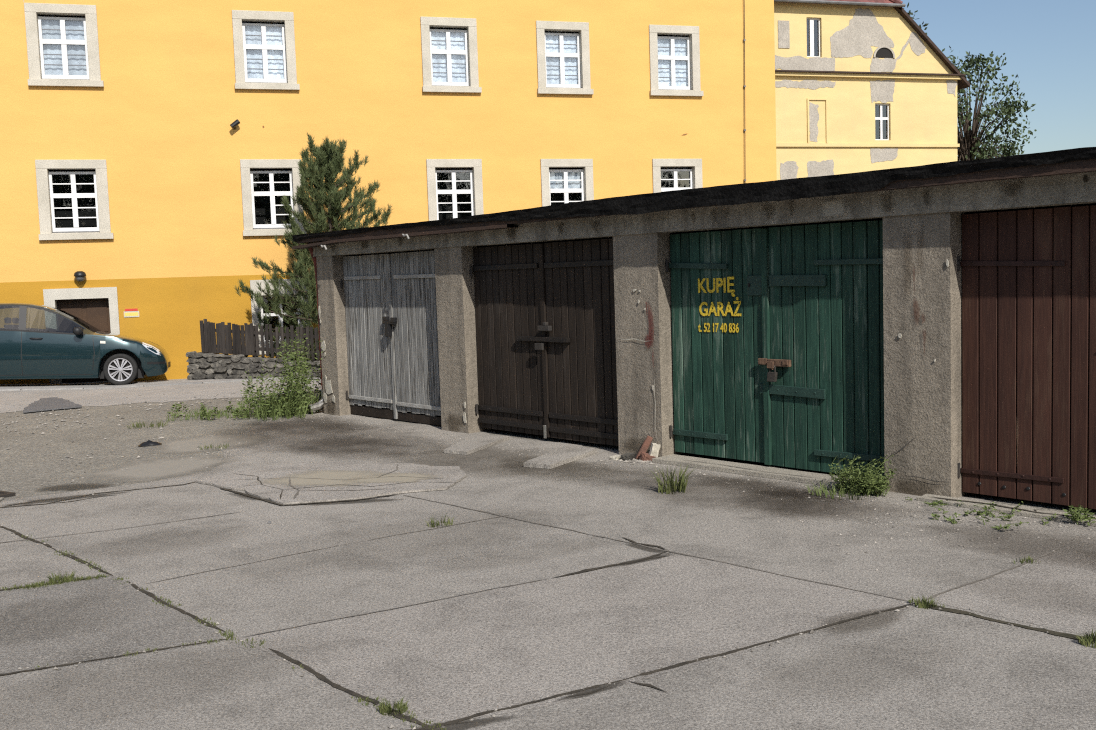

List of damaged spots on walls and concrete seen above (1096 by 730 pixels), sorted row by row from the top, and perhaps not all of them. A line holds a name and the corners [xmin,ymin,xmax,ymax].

flaking render [775,8,926,142]
flaking render [780,159,834,180]
corrosion [645,303,654,364]
crack [234,464,448,499]